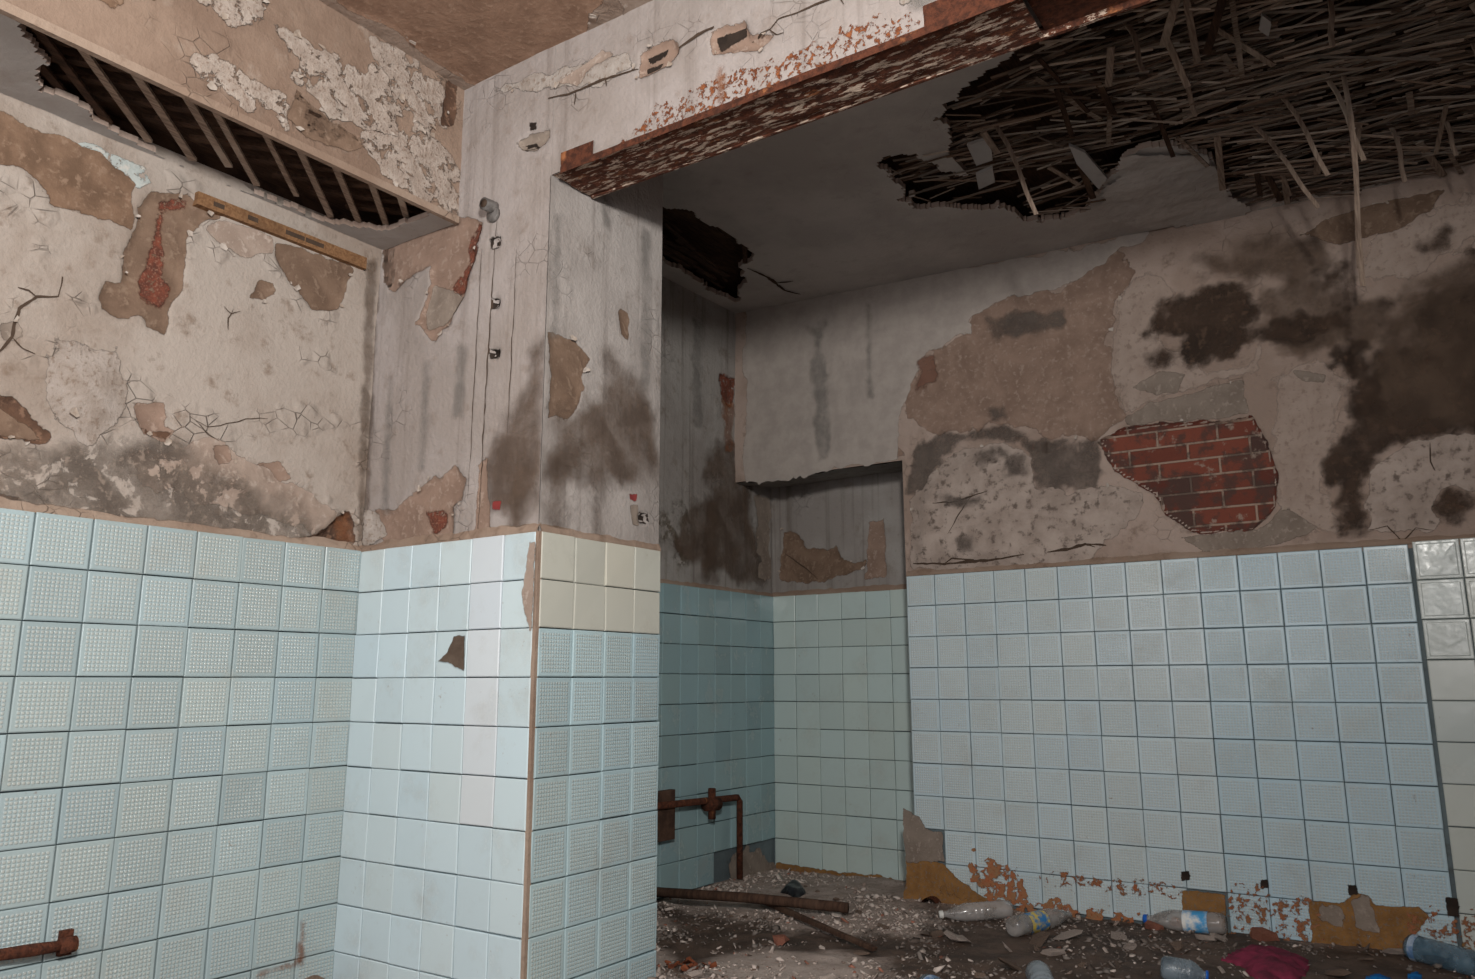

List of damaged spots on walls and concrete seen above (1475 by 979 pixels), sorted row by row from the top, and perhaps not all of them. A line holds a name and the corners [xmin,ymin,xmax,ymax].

crack [548,69,638,105]
corrosion [621,12,920,143]
crack [752,0,844,43]
flaking render [0,0,679,341]
crack [0,277,63,354]
water stain [487,360,657,528]
water stain [1143,238,1475,536]
water stain [659,442,764,583]
spalling [439,635,465,670]
peeling [903,808,1228,934]
corrosion [1224,883,1324,942]
corrosion [1397,906,1475,950]